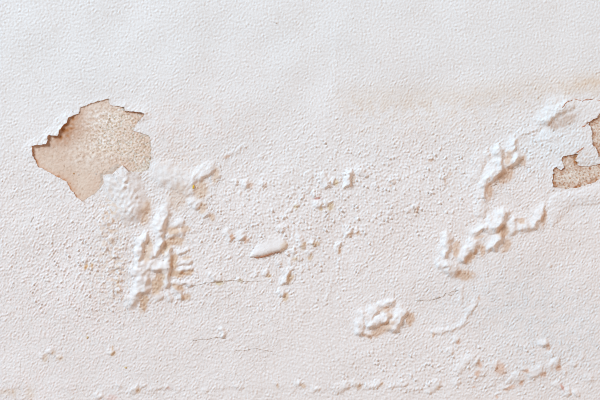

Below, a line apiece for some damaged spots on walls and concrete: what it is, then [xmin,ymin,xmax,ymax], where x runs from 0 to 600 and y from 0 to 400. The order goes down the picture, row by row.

peeling [21,93,153,202]
peeling [552,113,600,189]